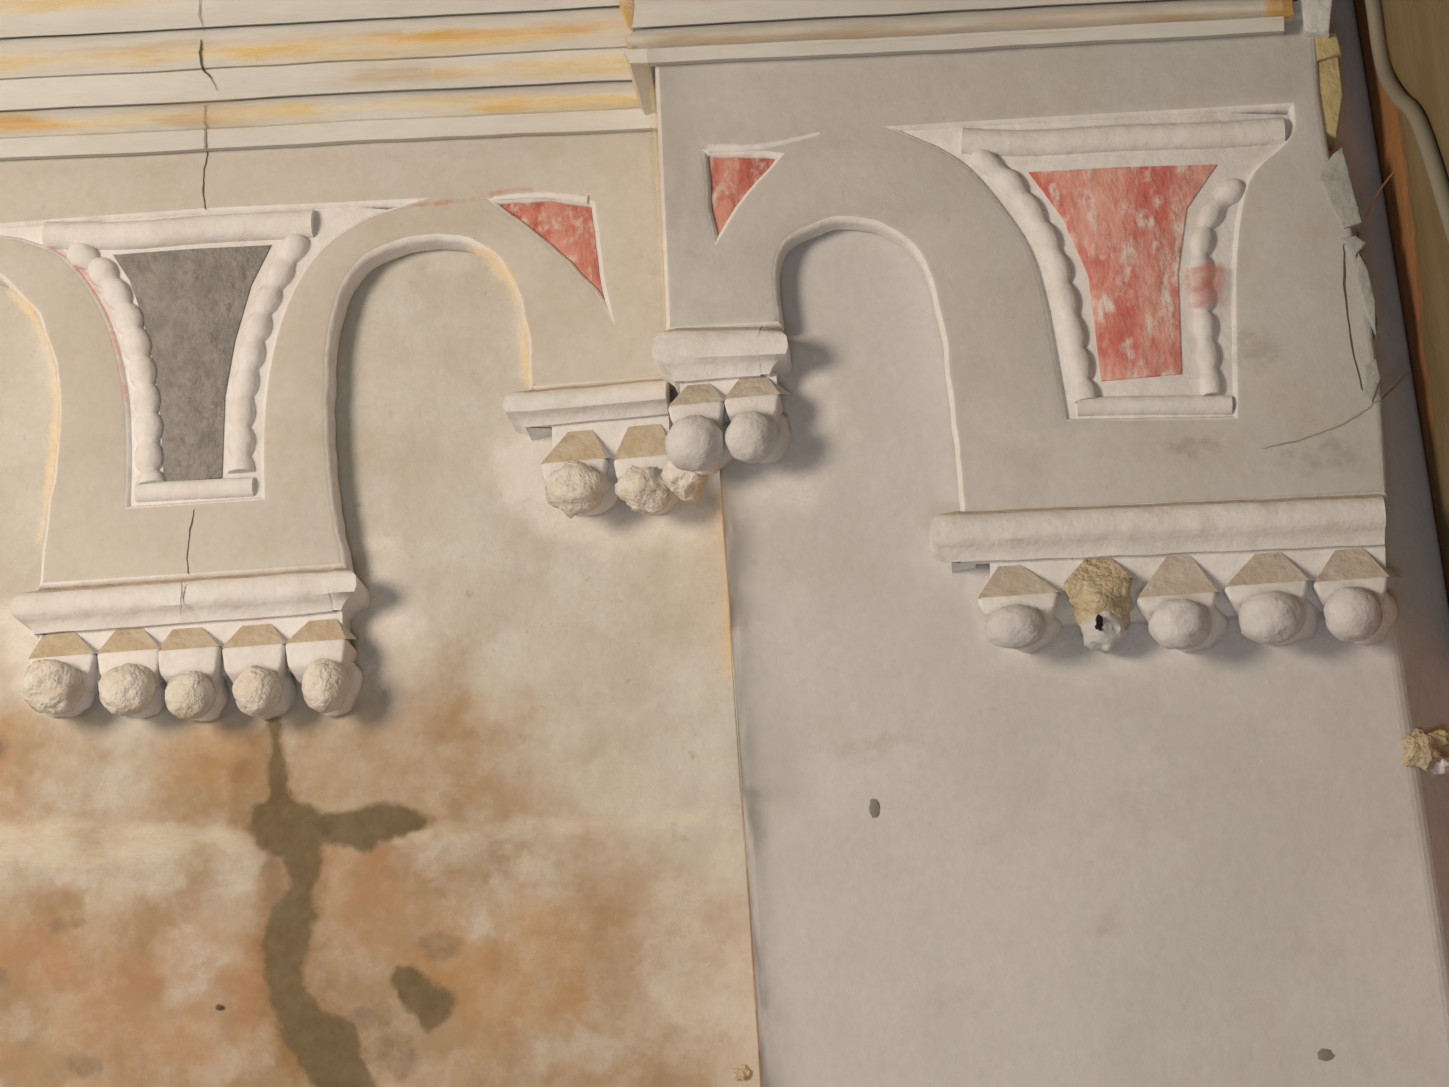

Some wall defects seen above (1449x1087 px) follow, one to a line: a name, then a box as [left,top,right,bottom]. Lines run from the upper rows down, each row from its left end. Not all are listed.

crack [198,0,217,209]
crack [180,509,195,615]
spalling [1069,576,1134,654]
leakage [0,718,708,1087]